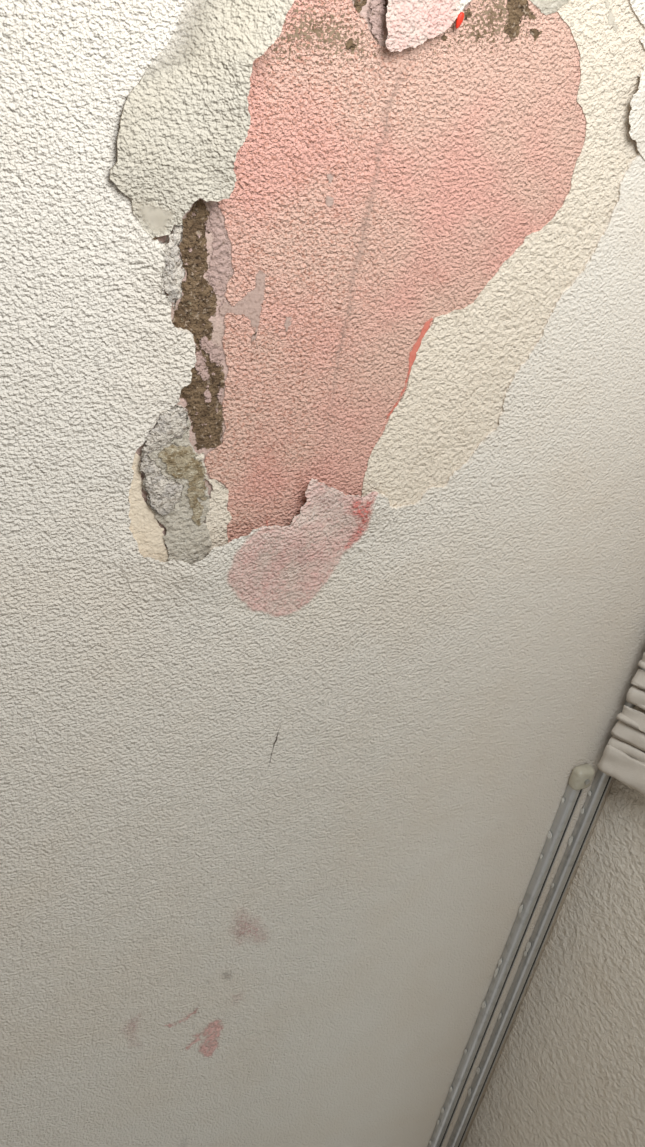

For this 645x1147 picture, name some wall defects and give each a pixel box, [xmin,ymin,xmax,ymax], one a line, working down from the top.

spalling [121,0,645,619]